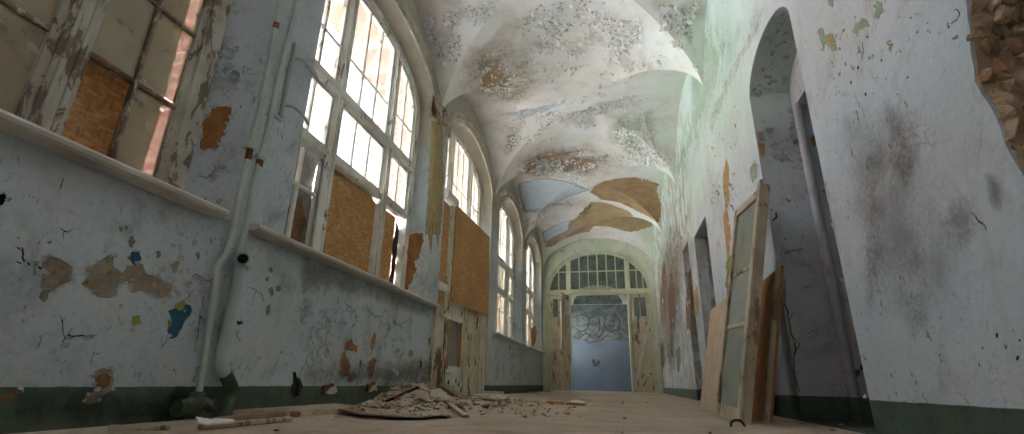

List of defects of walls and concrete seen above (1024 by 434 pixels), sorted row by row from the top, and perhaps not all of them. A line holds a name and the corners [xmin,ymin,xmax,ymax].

peeling [198,104,234,156]
peeling [424,0,700,247]
peeling [817,1,893,98]
spalling [899,0,1024,170]
crack [15,247,50,277]
crack [60,315,98,349]
peeling [38,226,211,348]
peeling [299,289,431,384]
peeling [404,233,425,290]
crack [770,220,815,391]
peeling [82,366,117,404]